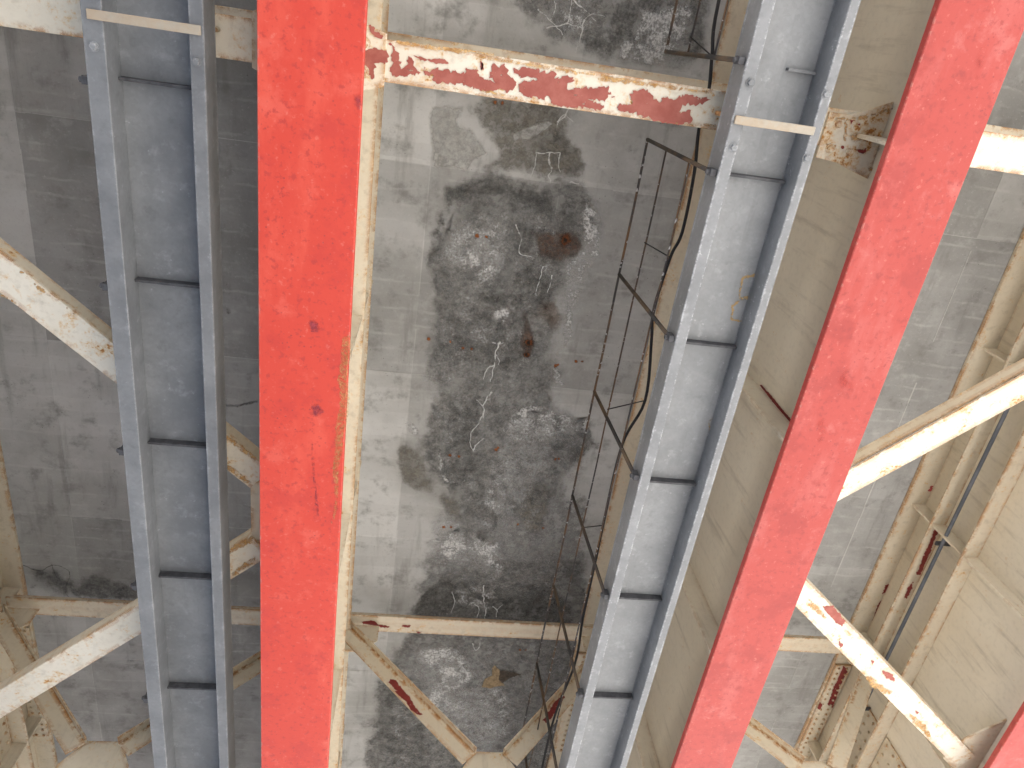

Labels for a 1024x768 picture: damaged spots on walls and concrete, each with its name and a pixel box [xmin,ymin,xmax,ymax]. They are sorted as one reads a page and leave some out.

crack [538,0,605,53]
damp [517,0,709,65]
peeling [365,25,710,125]
crack [530,152,579,184]
corrosion [538,232,580,260]
damp [399,98,599,624]
corrosion [521,318,534,358]
crack [470,342,502,450]
peeling [388,679,422,715]
damp [366,681,466,768]
damp [394,633,577,768]
peeling [818,666,847,710]